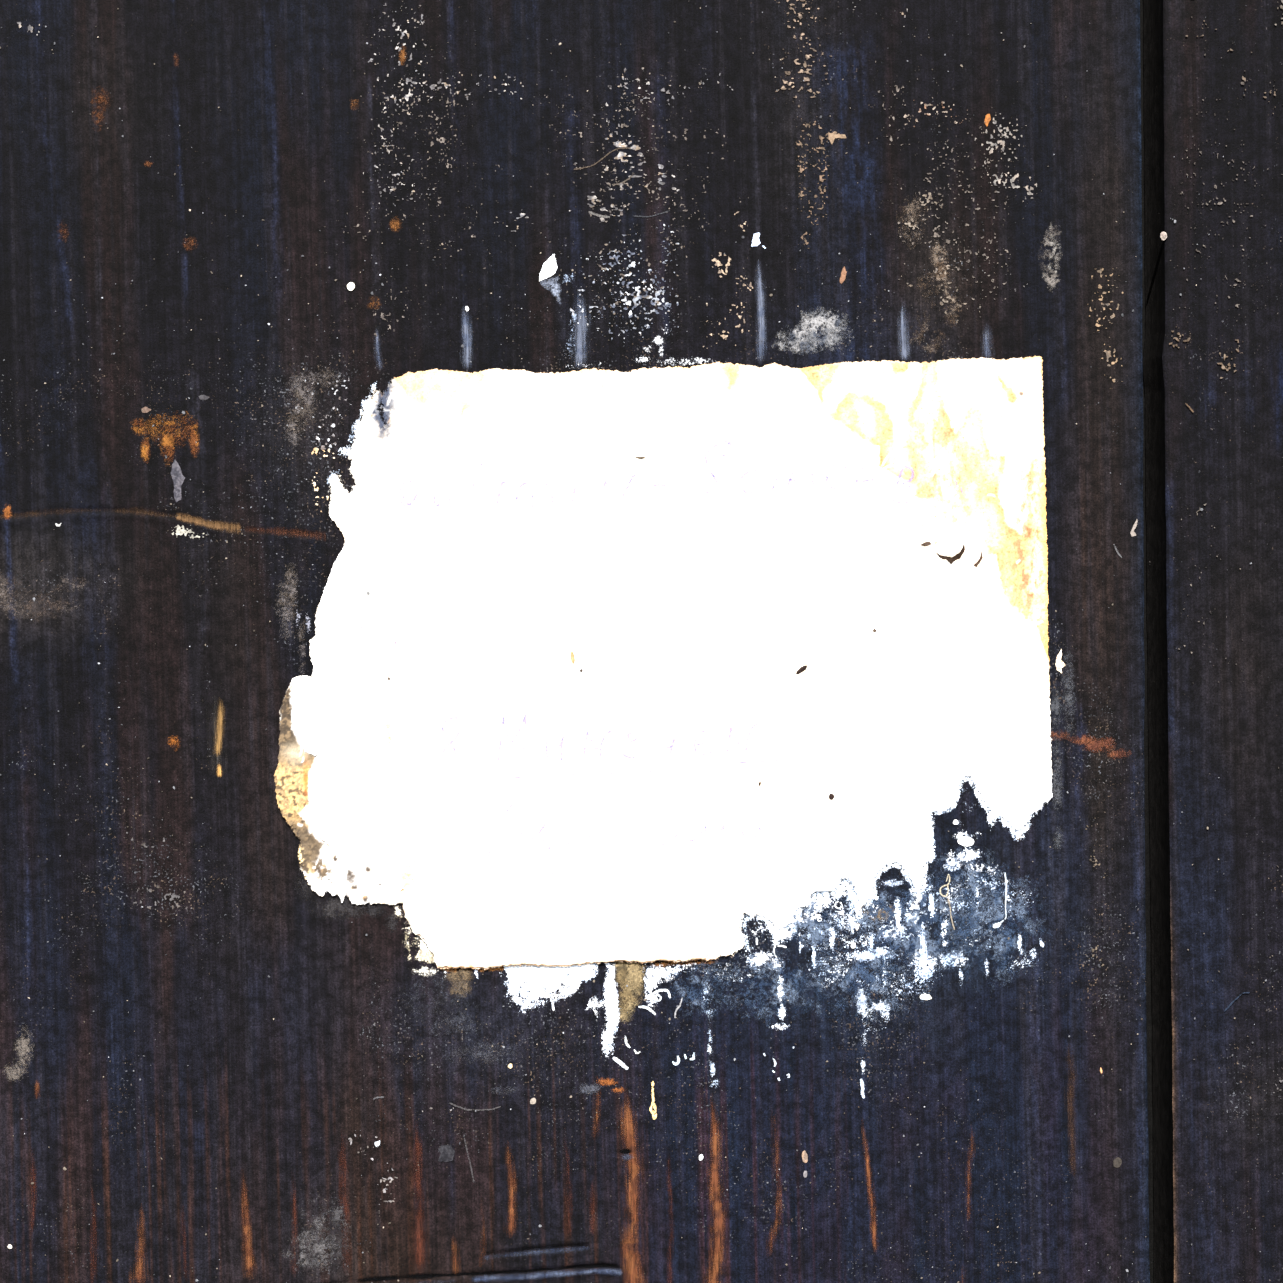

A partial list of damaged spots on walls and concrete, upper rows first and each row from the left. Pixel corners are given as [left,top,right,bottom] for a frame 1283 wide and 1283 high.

peeling [293,366,351,459]
peeling [404,932,446,973]
peeling [756,933,786,980]
peeling [503,963,640,1070]
peeling [638,965,685,1018]